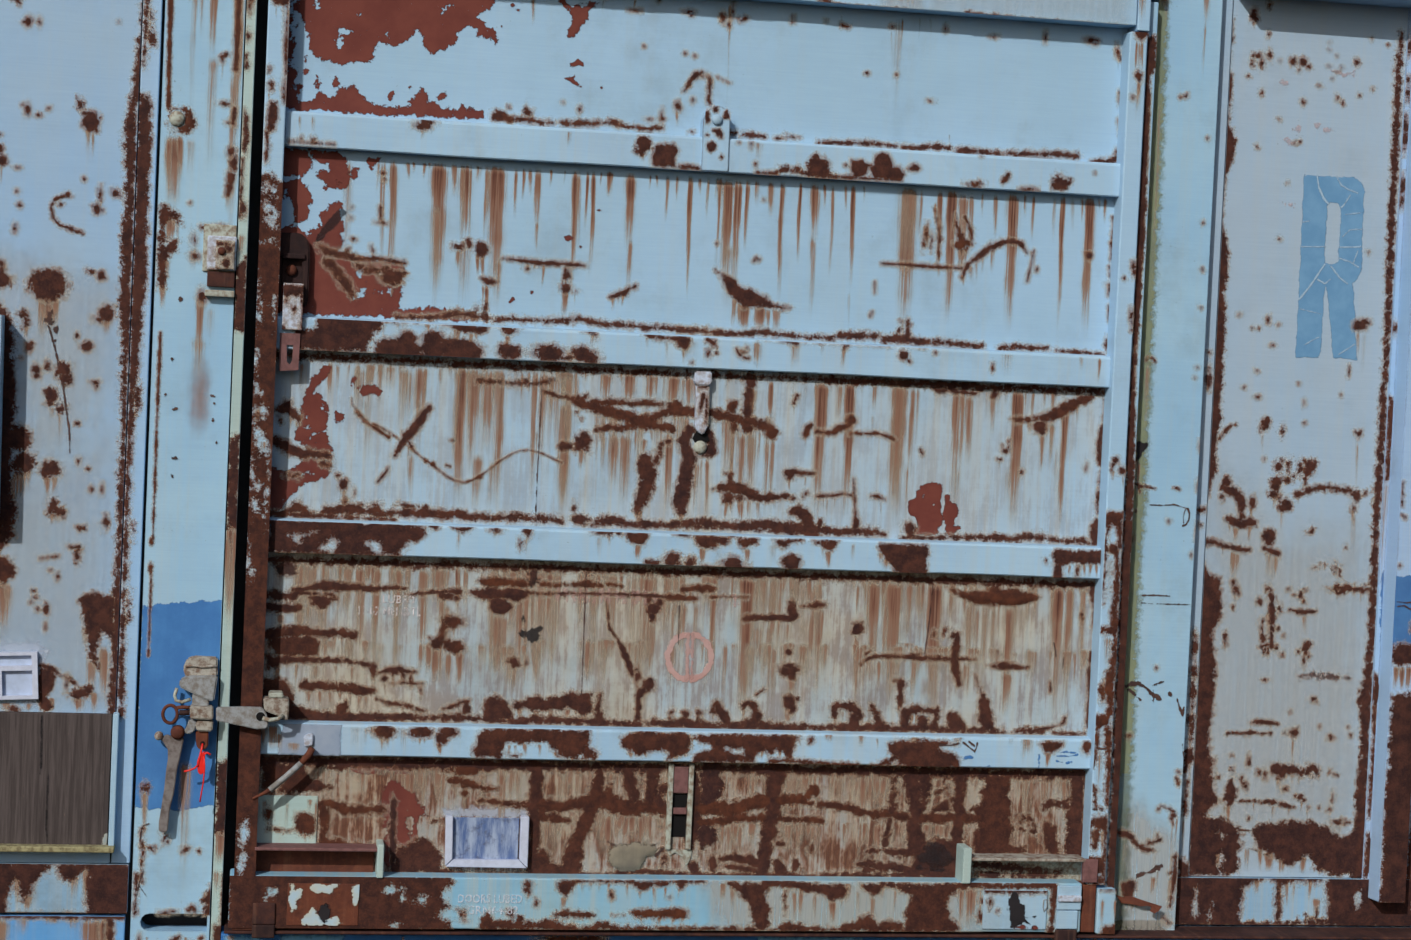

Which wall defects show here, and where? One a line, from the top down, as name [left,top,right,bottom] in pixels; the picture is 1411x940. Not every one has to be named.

rust [0,0,222,720]
rust [139,783,150,805]
peeling [286,0,520,120]
rust [158,0,1160,940]
peeling [908,482,961,536]
rust [1151,2,1411,926]